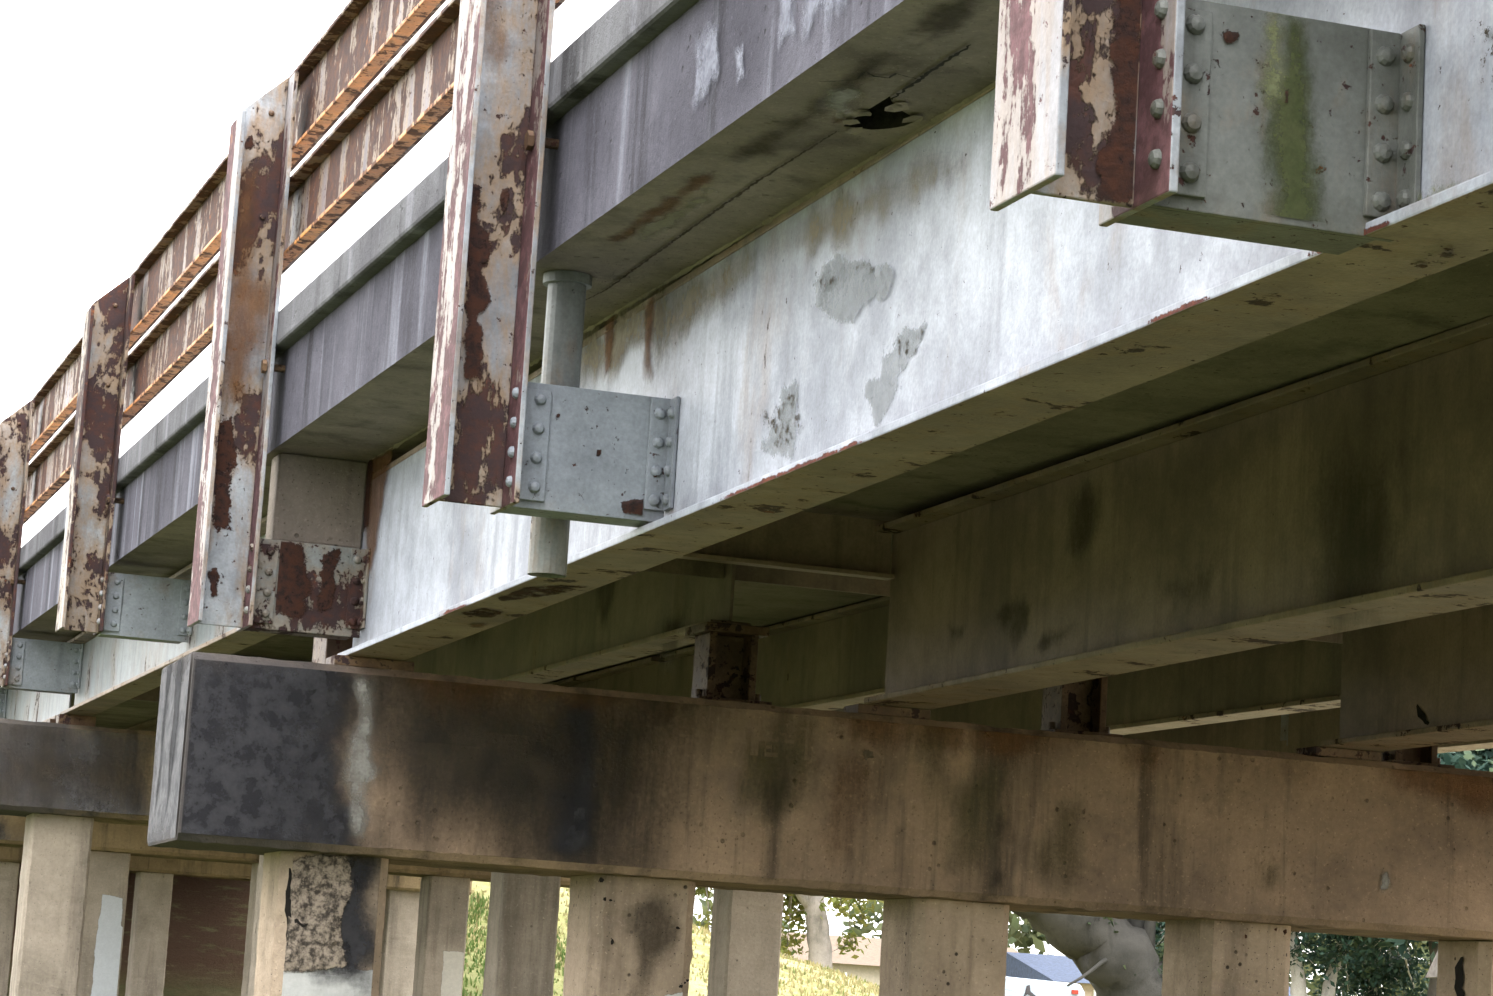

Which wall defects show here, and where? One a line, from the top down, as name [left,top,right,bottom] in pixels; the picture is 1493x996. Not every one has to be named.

spalling [828,88,924,135]
corrosion [1095,0,1141,203]
corrosion [500,187,510,212]
corrosion [225,243,269,398]
corrosion [462,184,493,379]
corrosion [211,416,240,533]
corrosion [207,567,220,598]
corrosion [275,541,342,619]
damp [0,654,698,979]
spalling [284,854,352,973]